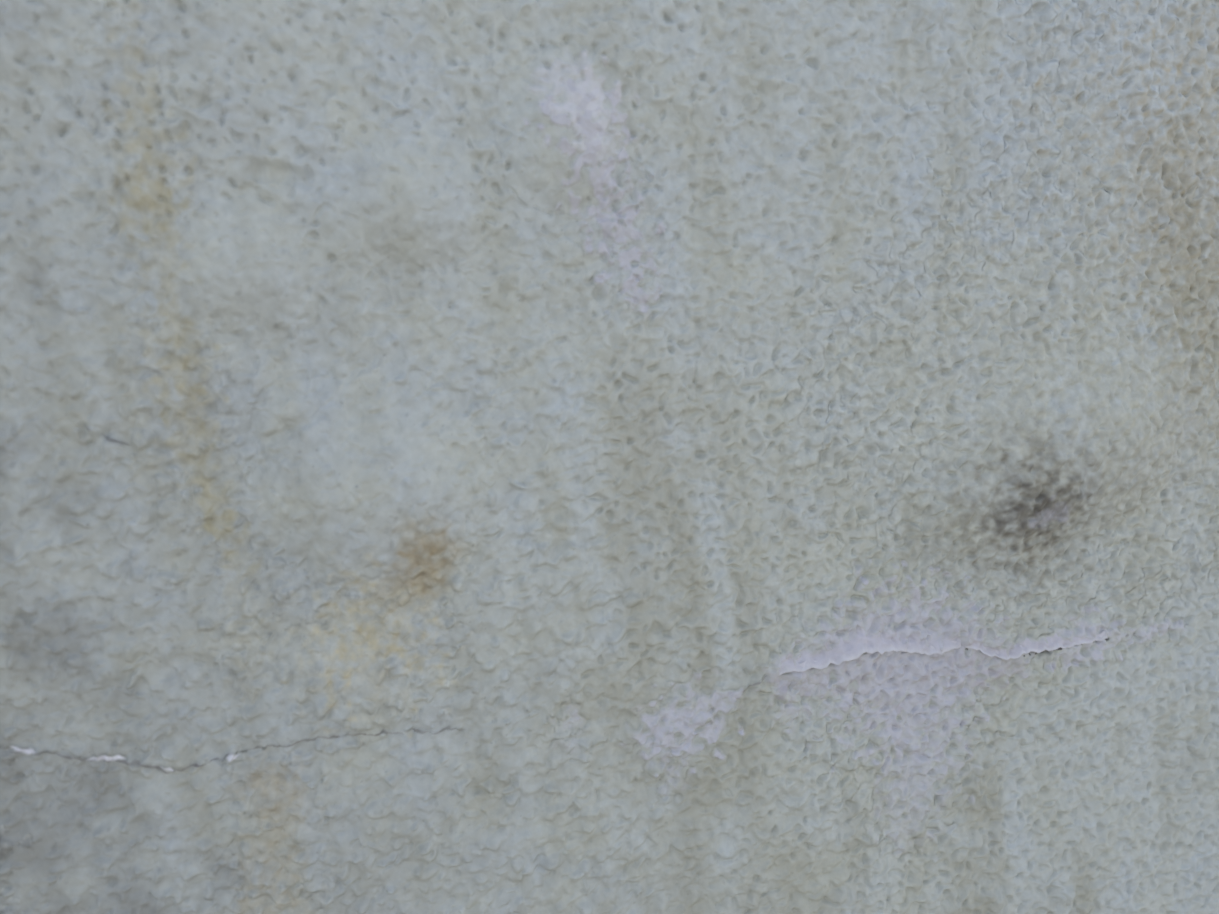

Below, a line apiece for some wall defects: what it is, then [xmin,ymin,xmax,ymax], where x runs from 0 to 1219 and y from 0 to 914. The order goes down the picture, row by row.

crack [742,540,1190,886]